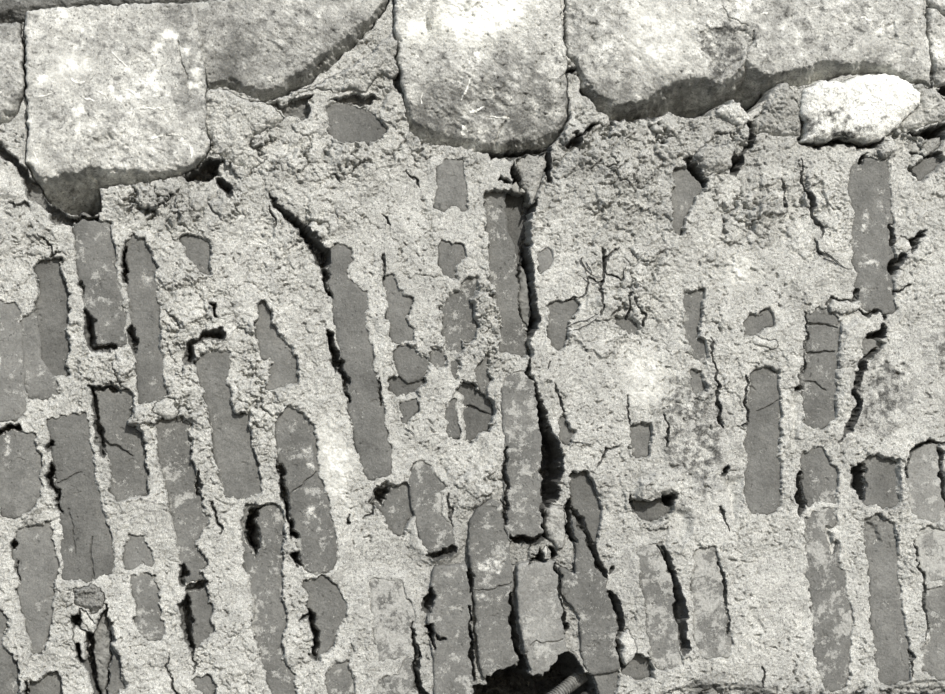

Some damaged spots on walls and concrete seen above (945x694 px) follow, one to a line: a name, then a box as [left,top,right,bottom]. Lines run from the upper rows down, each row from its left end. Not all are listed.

crack [483,120,553,215]
crack [268,193,333,298]
spalling [887,225,926,275]
spalling [83,309,140,355]
spalling [182,303,227,366]
crack [326,330,351,404]
crack [838,348,882,443]
crack [516,242,631,668]
spalling [71,604,113,694]
spalling [178,564,209,660]
spalling [467,592,598,694]
crack [657,546,692,656]